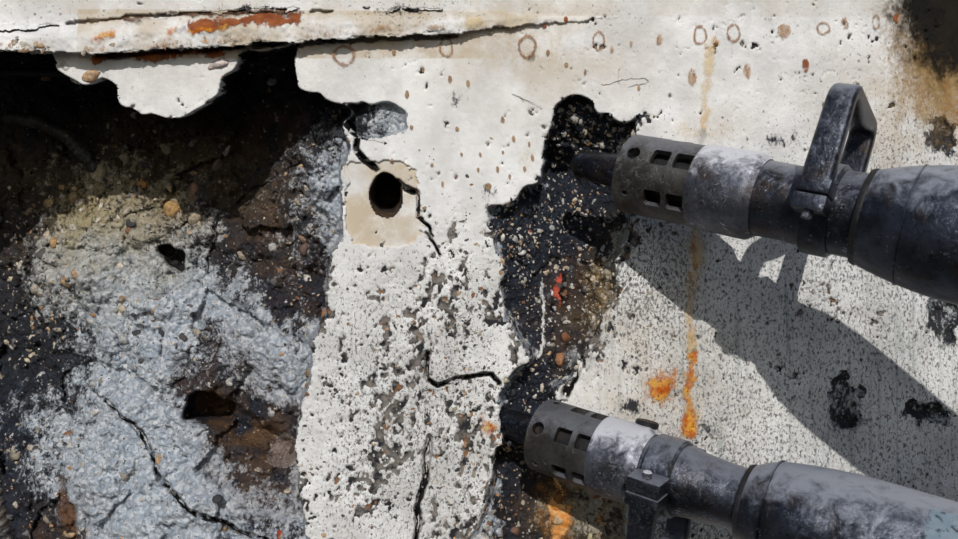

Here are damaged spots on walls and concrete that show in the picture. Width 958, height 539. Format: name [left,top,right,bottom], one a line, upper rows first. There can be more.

corrosion [86,8,304,65]
damp [886,0,958,124]
crack [337,114,383,170]
spalling [0,43,409,539]
crack [425,352,500,390]
spalling [468,94,644,539]
corrosion [647,305,698,439]
spalling [827,370,869,433]
spalling [926,298,958,348]
corrosion [57,476,79,538]
crack [82,377,267,539]
crack [413,437,431,539]